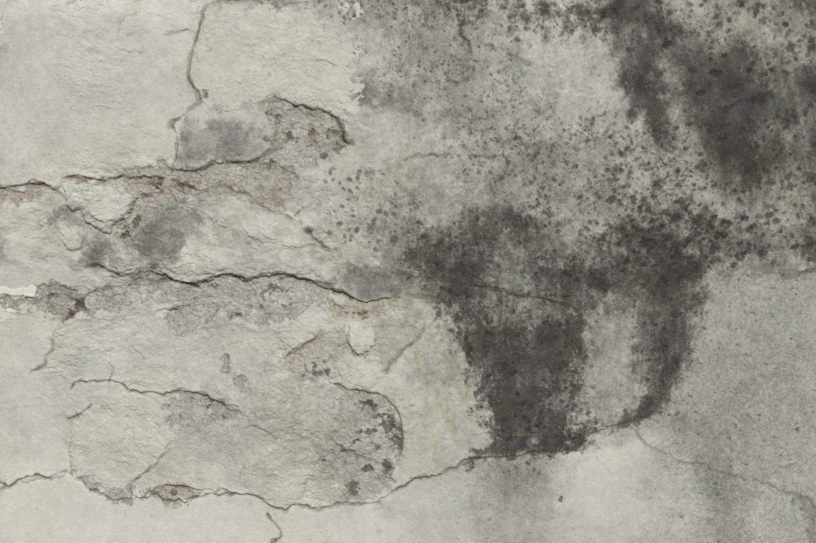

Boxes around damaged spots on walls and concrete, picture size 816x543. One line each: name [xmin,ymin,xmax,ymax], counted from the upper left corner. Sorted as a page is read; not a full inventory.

peeling [95,0,365,247]
damp [509,0,816,204]
crack [160,278,207,286]
spalling [0,266,386,336]
crack [230,273,286,281]
damp [399,138,782,471]
spalling [285,328,351,387]
crack [0,471,66,489]
peeling [64,388,239,509]
spalling [316,388,404,503]
crack [396,468,450,490]
crack [257,496,322,543]